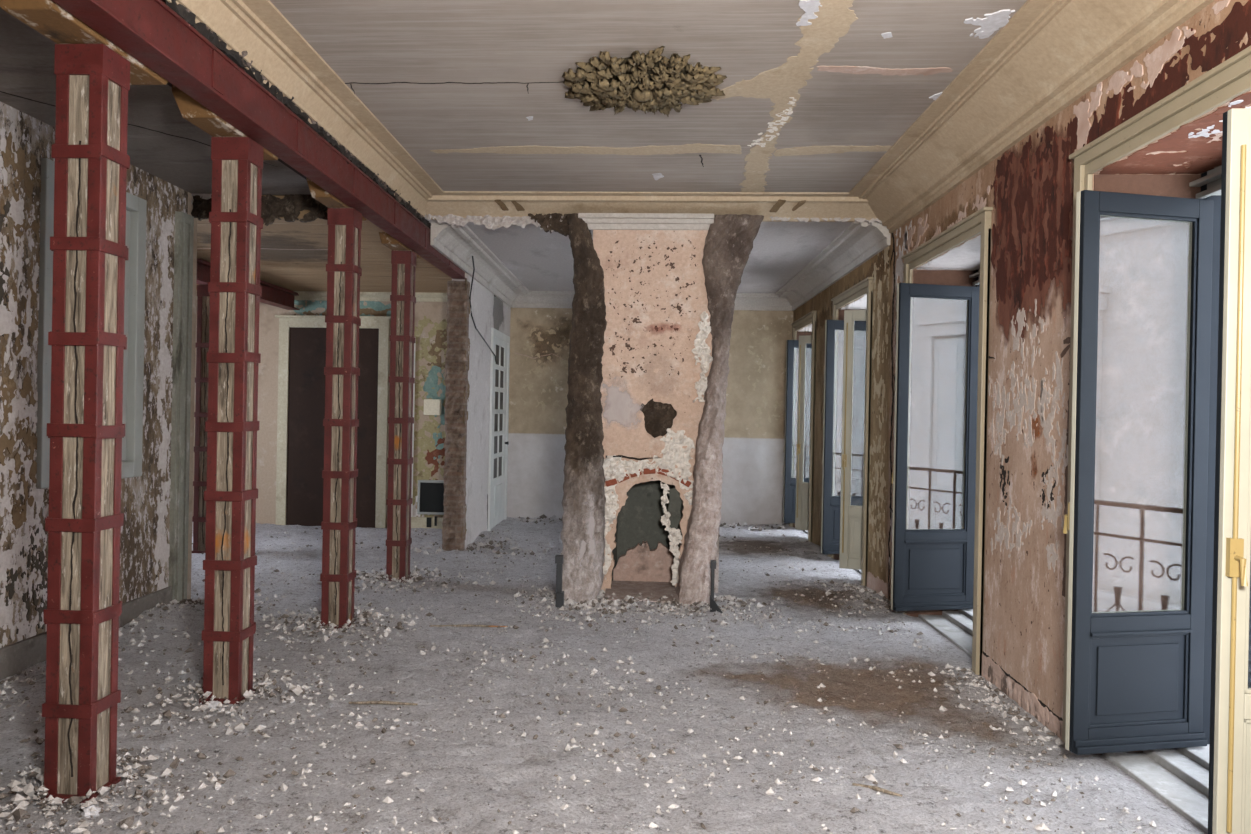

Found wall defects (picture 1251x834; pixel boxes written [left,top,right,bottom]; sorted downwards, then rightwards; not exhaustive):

peeling [430,0,953,192]
peeling [0,132,49,648]
flaking render [425,432,445,480]
flaking render [427,329,447,368]
spalling [603,399,695,586]
peeling [868,0,1251,572]